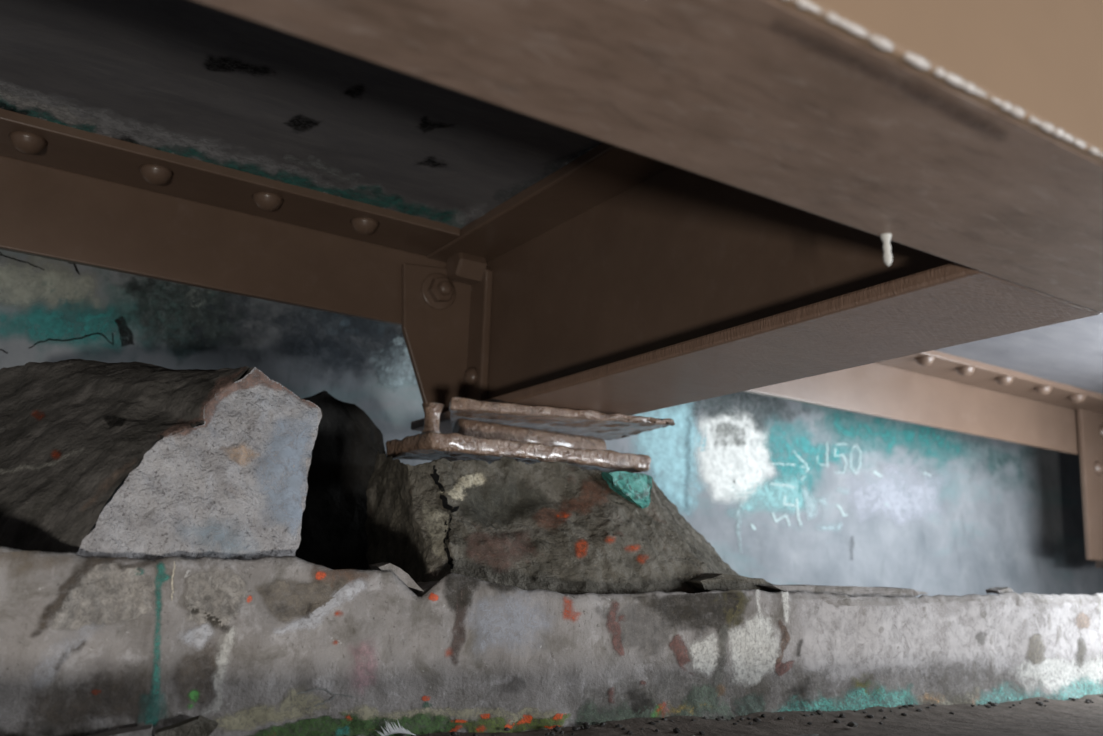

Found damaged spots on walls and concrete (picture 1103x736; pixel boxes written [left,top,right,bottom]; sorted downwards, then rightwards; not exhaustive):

crack [0,252,44,270]
crack [0,332,114,354]
crack [430,465,459,569]
damp [636,402,706,509]
damp [737,407,963,546]